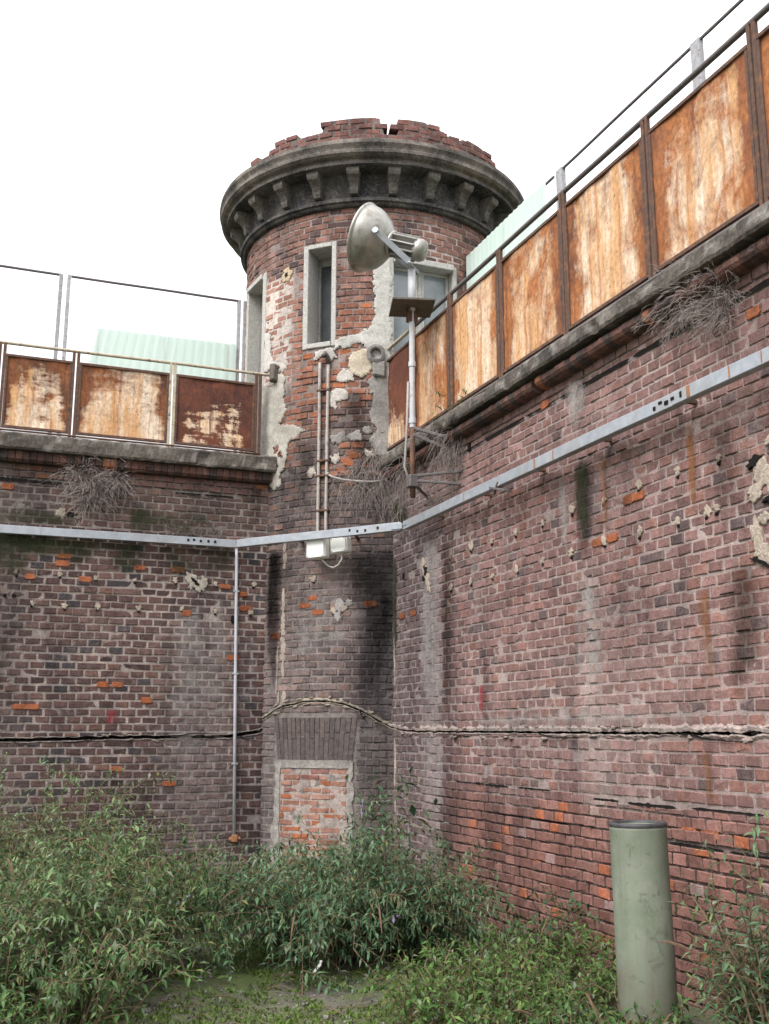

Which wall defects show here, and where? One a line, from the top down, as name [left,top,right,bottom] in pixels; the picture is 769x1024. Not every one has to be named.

peeling [260,330,306,490]
peeling [314,258,393,486]
spalling [745,454,769,567]
spalling [172,567,252,624]
spalling [299,595,377,622]
crack [0,696,769,760]